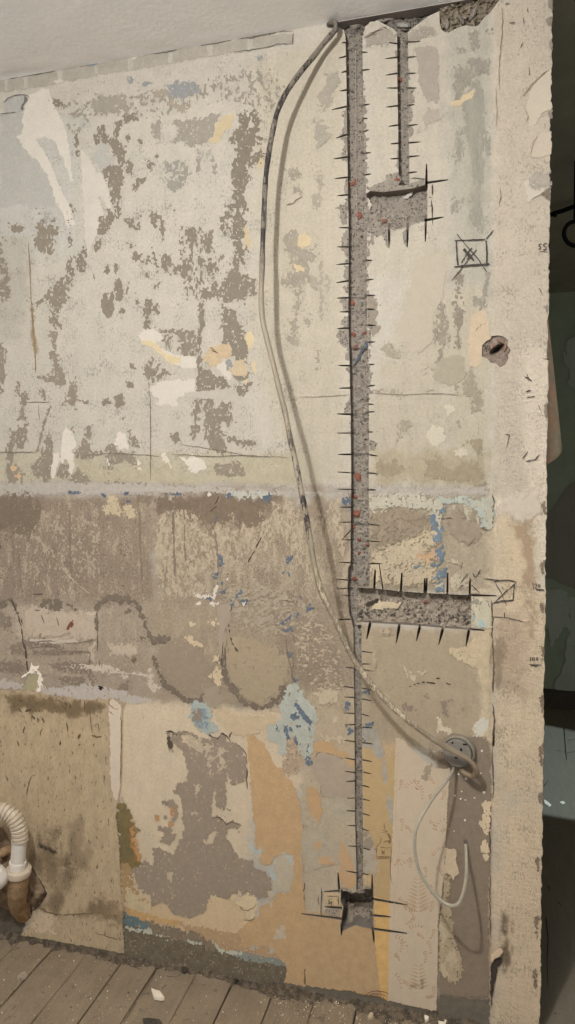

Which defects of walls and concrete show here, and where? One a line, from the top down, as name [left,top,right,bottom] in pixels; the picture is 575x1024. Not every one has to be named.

flaking render [342,0,499,233]
spalling [482,336,510,367]
flaking render [0,55,393,997]